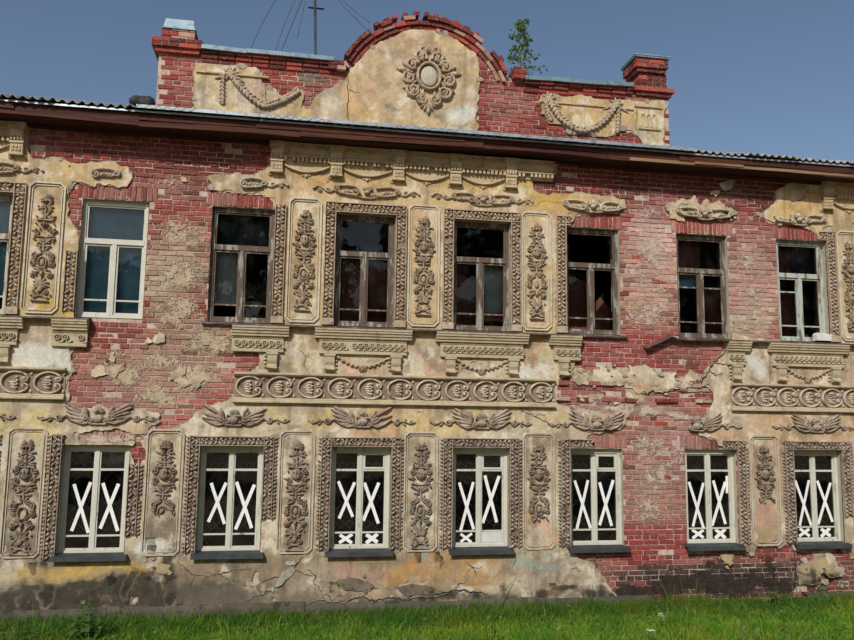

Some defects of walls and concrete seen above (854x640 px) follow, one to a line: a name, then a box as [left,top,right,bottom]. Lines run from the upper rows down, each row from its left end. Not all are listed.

flaking render [29,128,275,429]
flaking render [78,428,146,463]
damp [271,436,321,560]
crack [177,556,490,604]
damp [0,455,848,610]
flaking render [533,165,854,604]
crack [697,350,726,391]